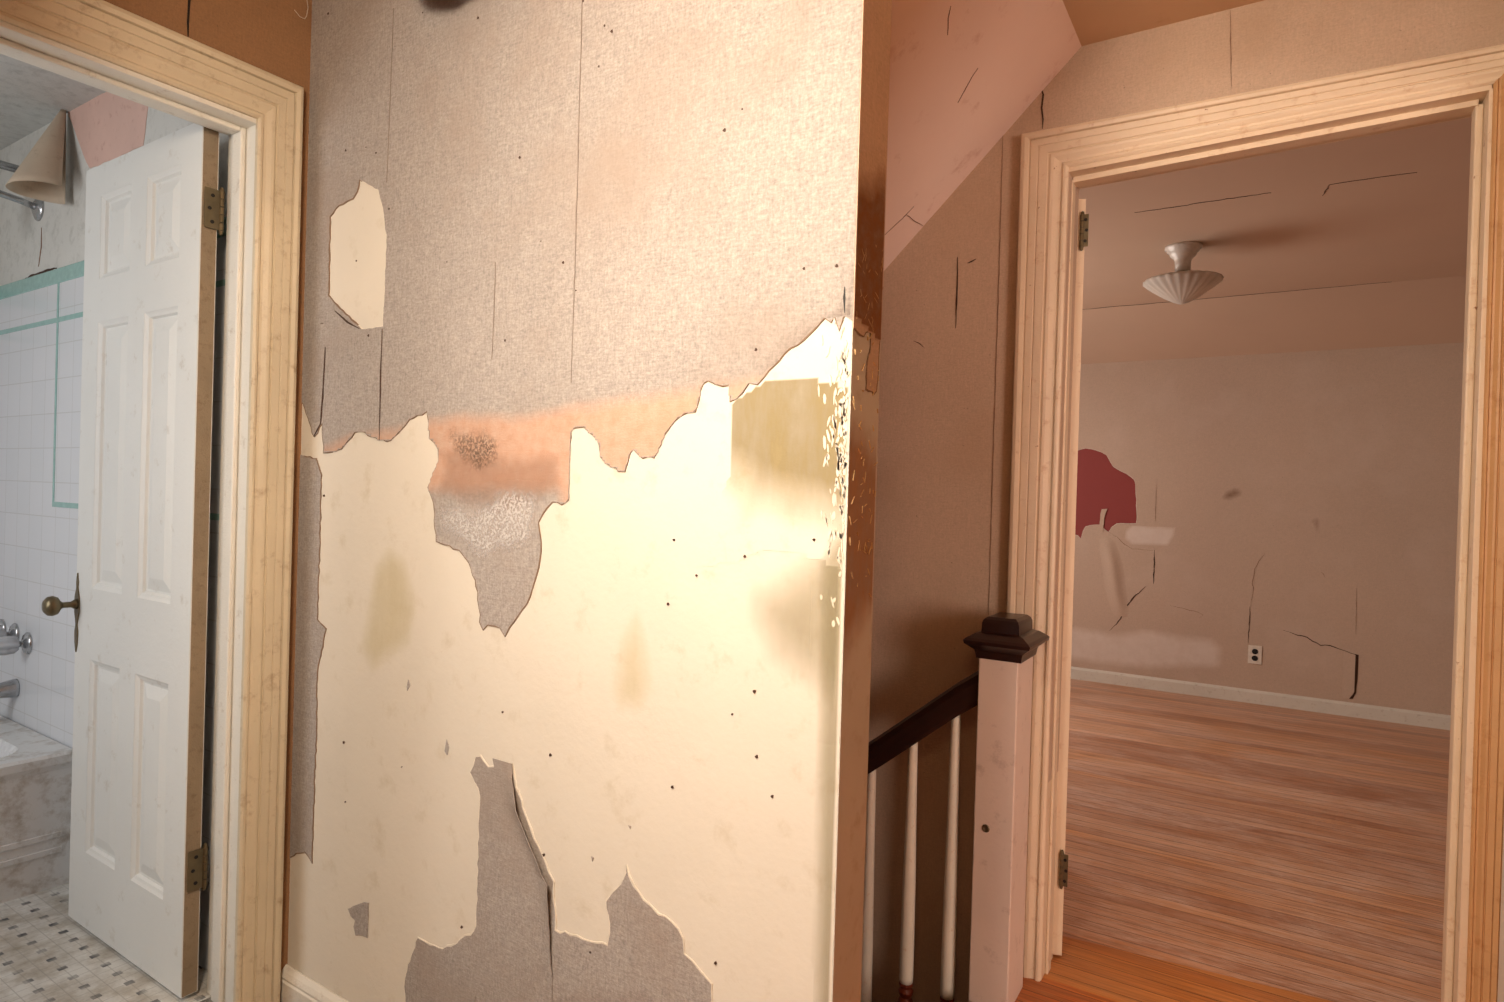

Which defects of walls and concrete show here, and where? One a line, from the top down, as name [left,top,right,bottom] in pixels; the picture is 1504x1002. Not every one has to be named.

leakage [324,318,851,627]
crack [1248,556,1359,699]
peeling [348,902,369,938]